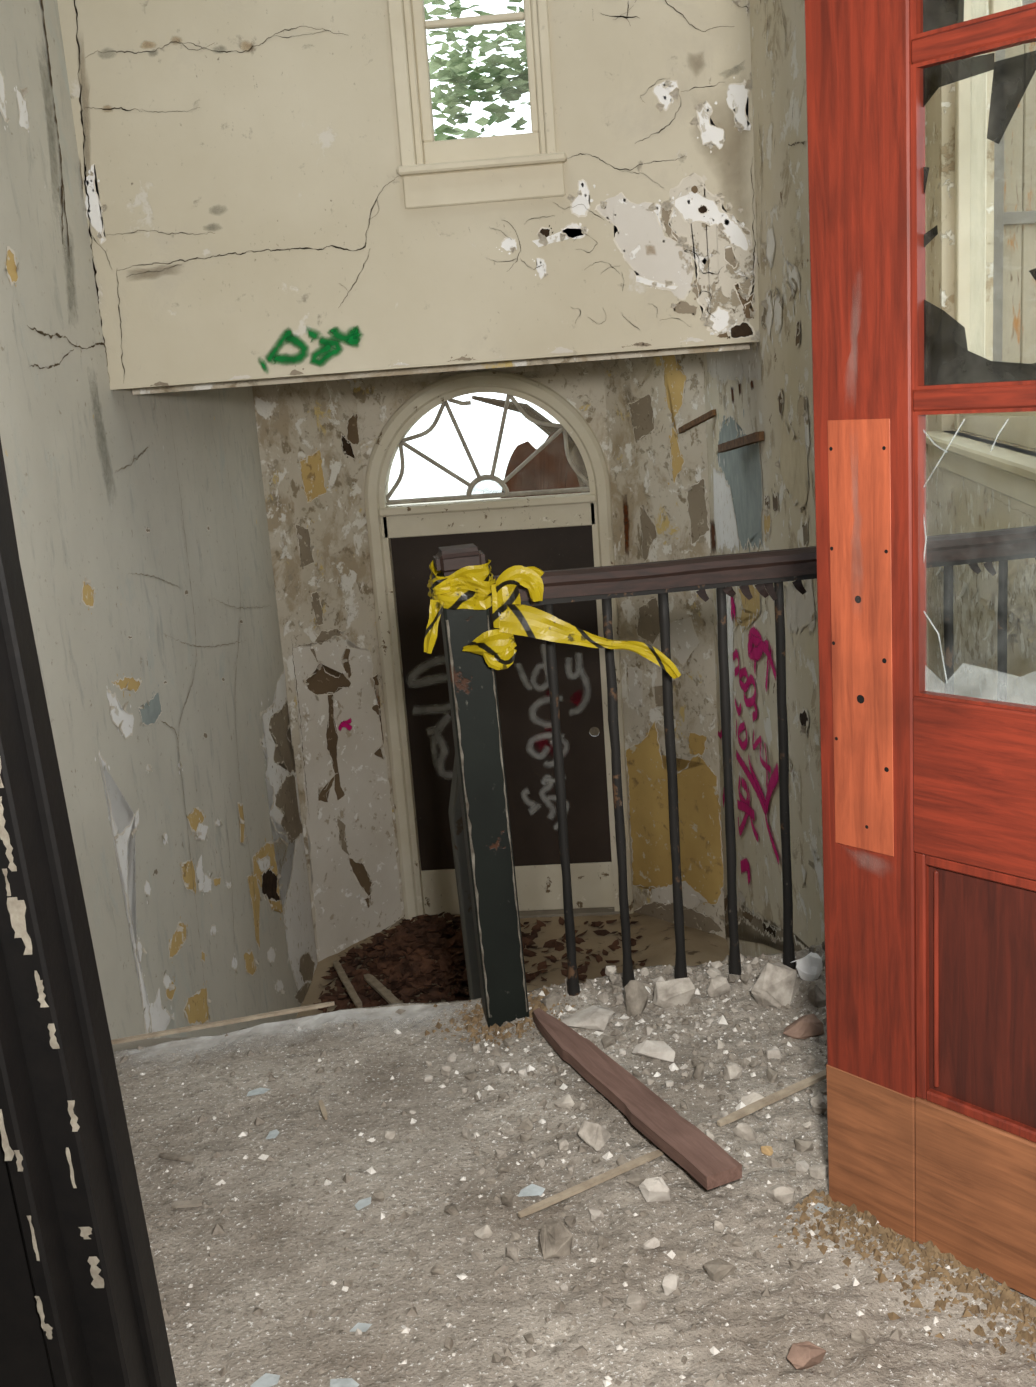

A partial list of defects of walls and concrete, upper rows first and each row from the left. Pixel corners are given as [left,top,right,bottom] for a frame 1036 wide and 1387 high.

crack [603,0,729,32]
peeling [635,77,752,153]
crack [27,0,400,383]
peeling [496,153,812,554]
flaking render [341,412,363,459]
peeling [299,448,327,503]
peeling [295,524,315,569]
peeling [638,505,657,563]
peeling [626,579,817,952]
peeling [179,587,405,1004]
peeling [801,846,824,903]